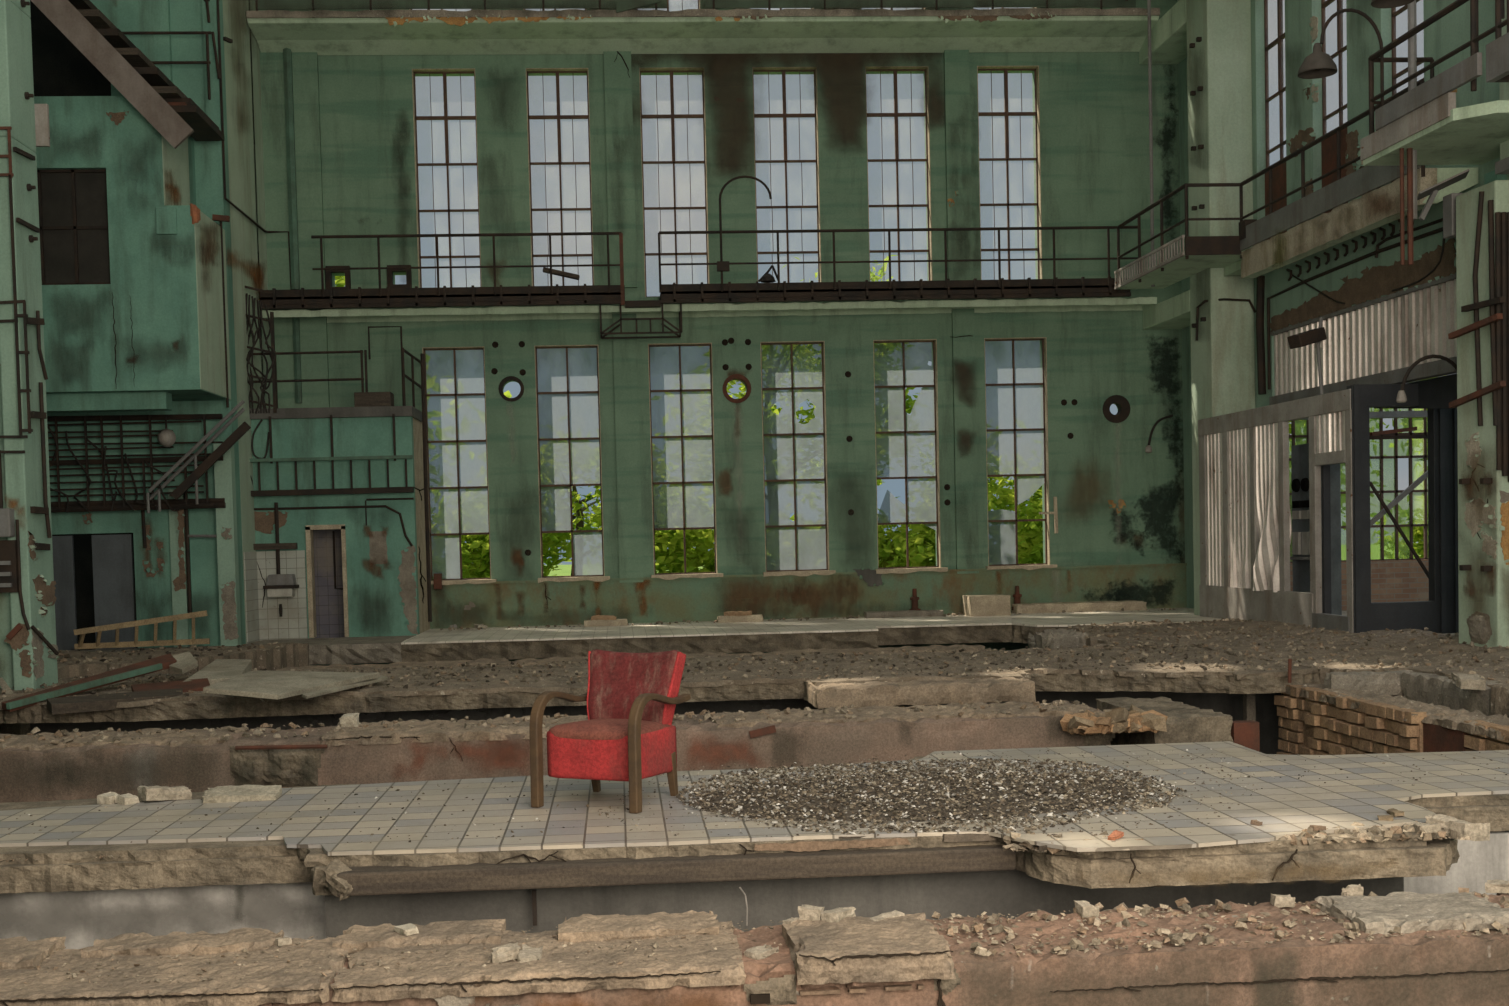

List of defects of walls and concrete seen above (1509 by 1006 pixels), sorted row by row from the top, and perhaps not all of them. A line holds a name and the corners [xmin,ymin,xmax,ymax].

peeling [4,531,59,680]
peeling [369,531,419,635]
crack [0,971,721,1006]